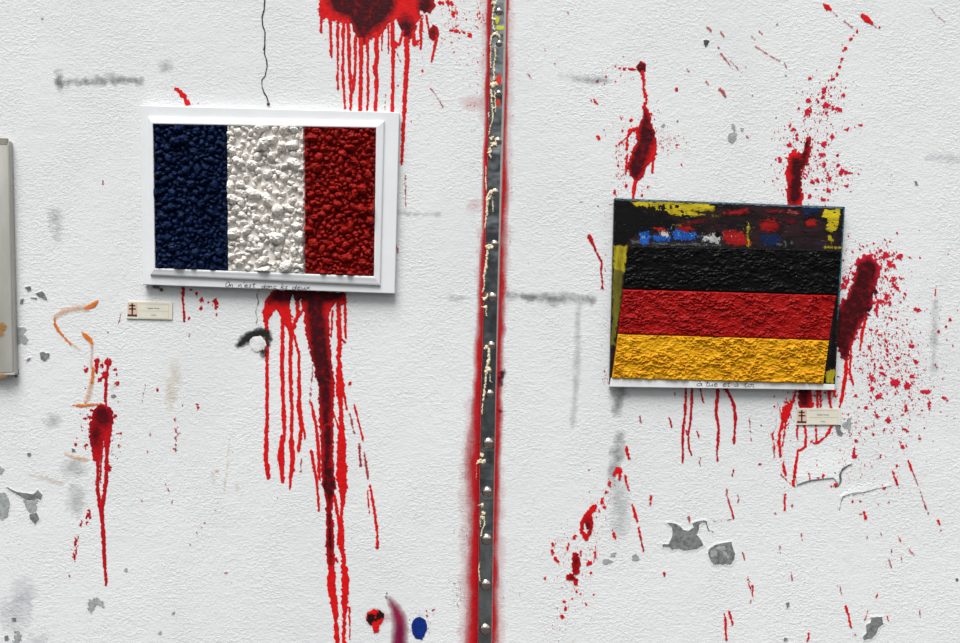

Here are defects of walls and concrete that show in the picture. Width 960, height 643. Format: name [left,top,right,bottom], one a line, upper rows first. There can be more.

crack [261,0,269,102]
peeling [0,466,44,525]
spalling [660,517,738,568]
spalling [860,615,886,643]